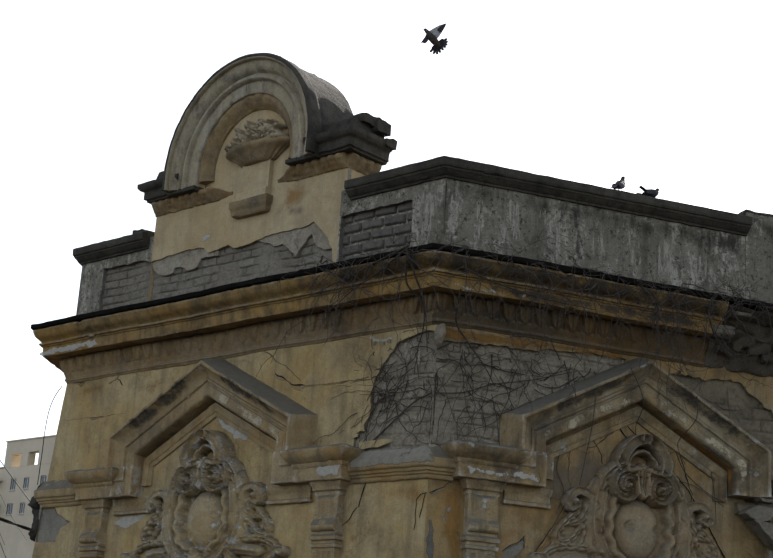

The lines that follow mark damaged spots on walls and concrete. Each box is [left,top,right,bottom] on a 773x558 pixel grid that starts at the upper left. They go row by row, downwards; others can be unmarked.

flaking render [342,201,412,261]
flaking render [102,223,332,310]
peeling [40,339,97,356]
crack [264,350,371,391]
flaking render [316,323,625,476]
peeling [467,466,538,482]
peeling [702,435,747,481]
flaking render [37,507,70,543]
crack [342,483,366,526]
peeling [426,520,434,558]